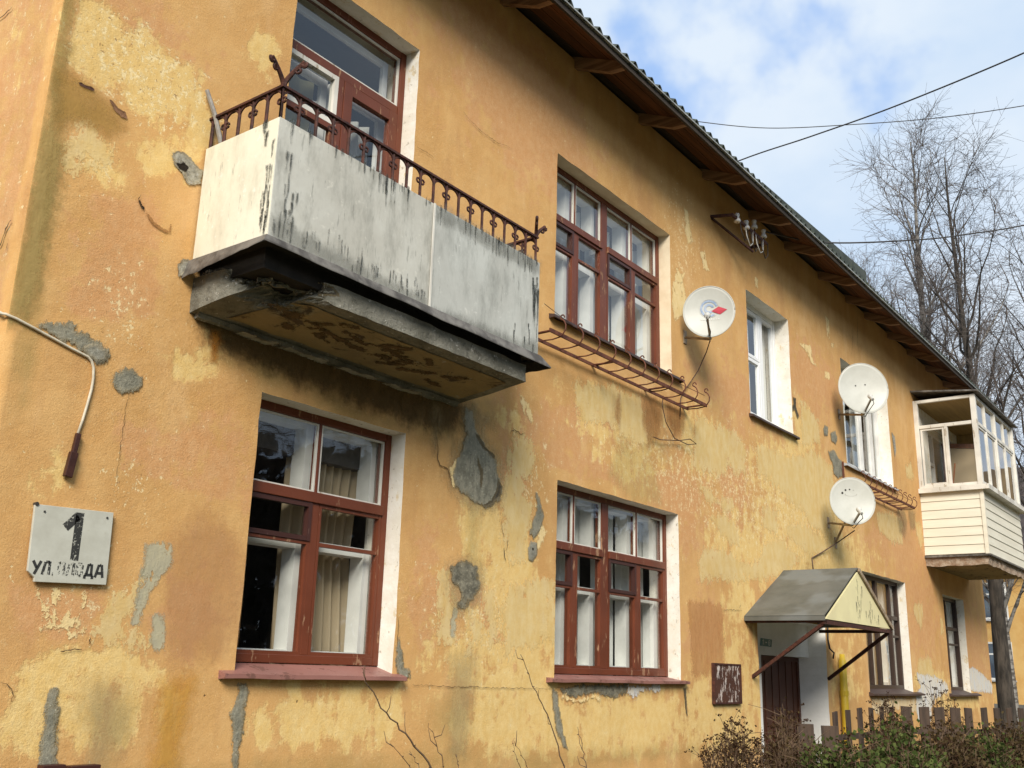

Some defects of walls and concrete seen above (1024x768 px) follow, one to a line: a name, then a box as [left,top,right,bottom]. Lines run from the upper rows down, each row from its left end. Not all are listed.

flaking render [172,151,203,185]
damp [259,120,321,249]
damp [335,146,410,203]
damp [205,322,462,431]
peeling [238,303,471,395]
peeling [450,395,547,565]
peeling [36,541,173,660]
peeling [435,559,556,662]